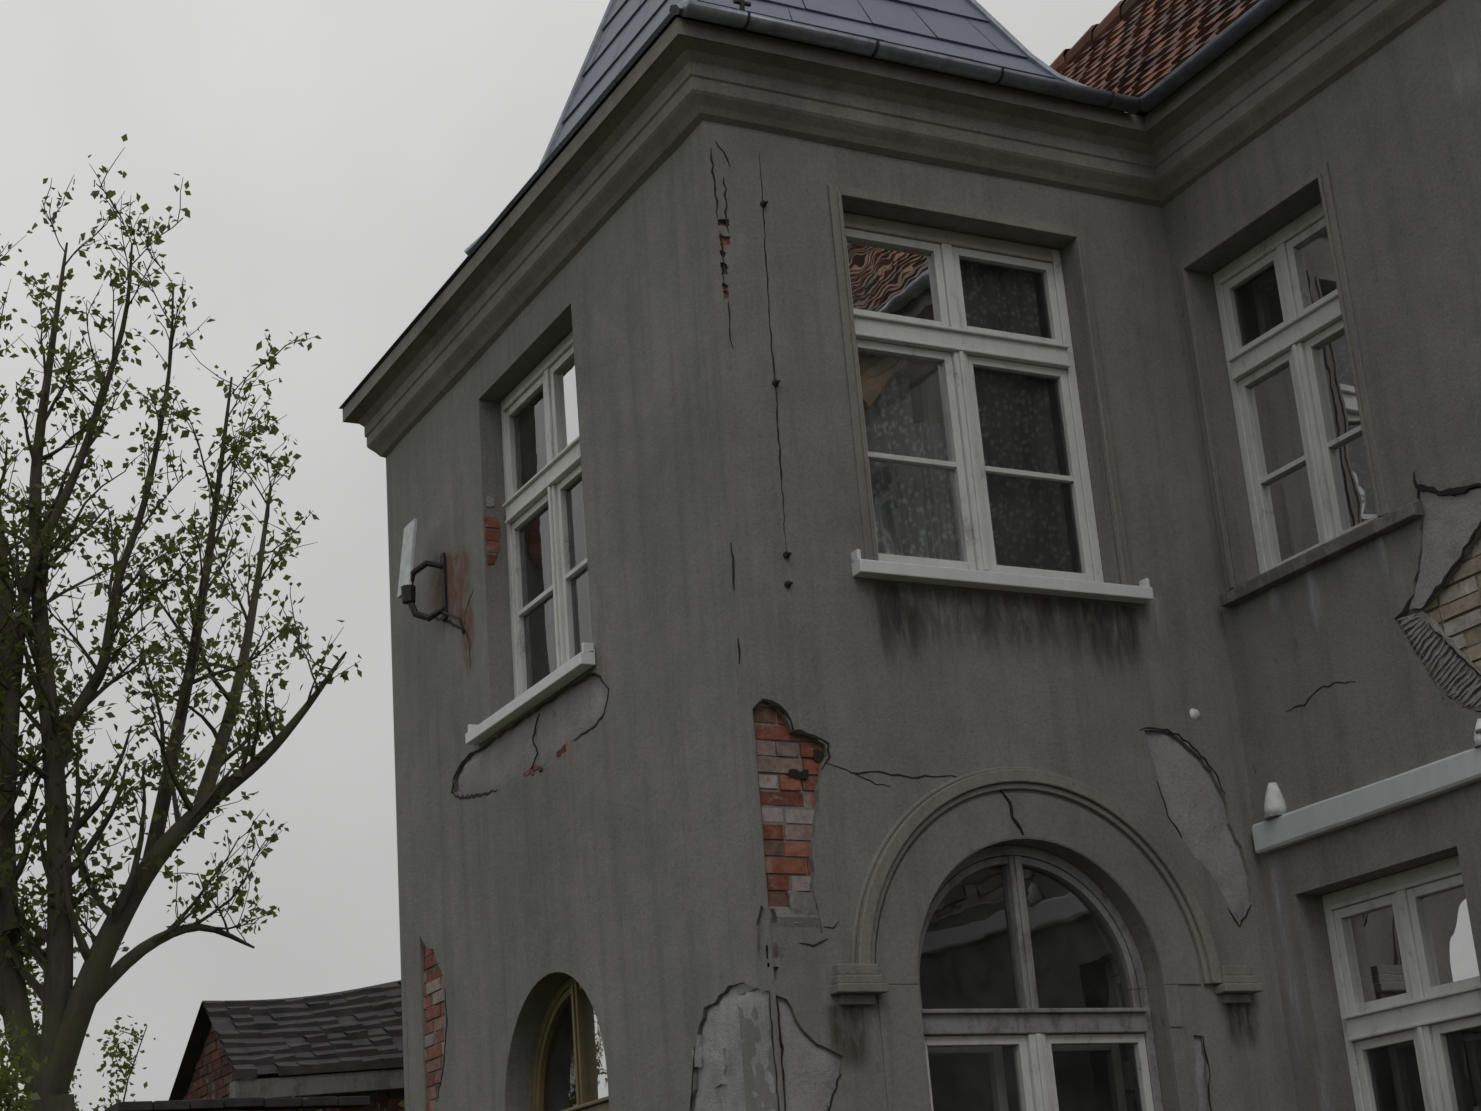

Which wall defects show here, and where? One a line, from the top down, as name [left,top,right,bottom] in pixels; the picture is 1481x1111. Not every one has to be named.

crack [710,141,787,551]
spalling [1397,472,1481,712]
spalling [451,672,609,800]
spalling [753,698,839,947]
crack [827,763,957,787]
crack [1000,790,1024,835]
spalling [1140,727,1251,927]
crack [1287,681,1355,711]
spalling [423,943,448,1111]
flaking render [690,985,841,1111]